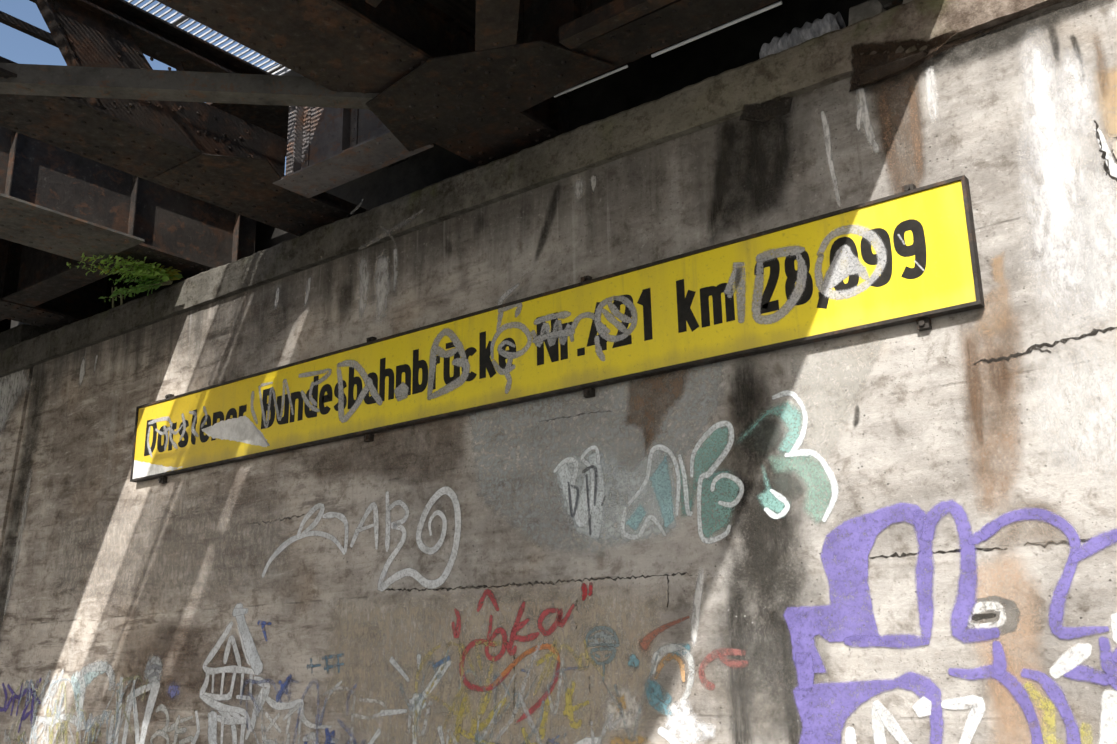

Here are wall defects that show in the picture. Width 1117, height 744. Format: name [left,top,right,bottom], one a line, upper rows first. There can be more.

water stain [711,117,790,231]
crack [1094,120,1117,181]
peeling [1095,128,1117,178]
crack [974,327,1117,365]
corrosion [964,321,1016,505]
water stain [727,369,809,744]
crack [870,537,1110,559]
crack [385,572,692,629]